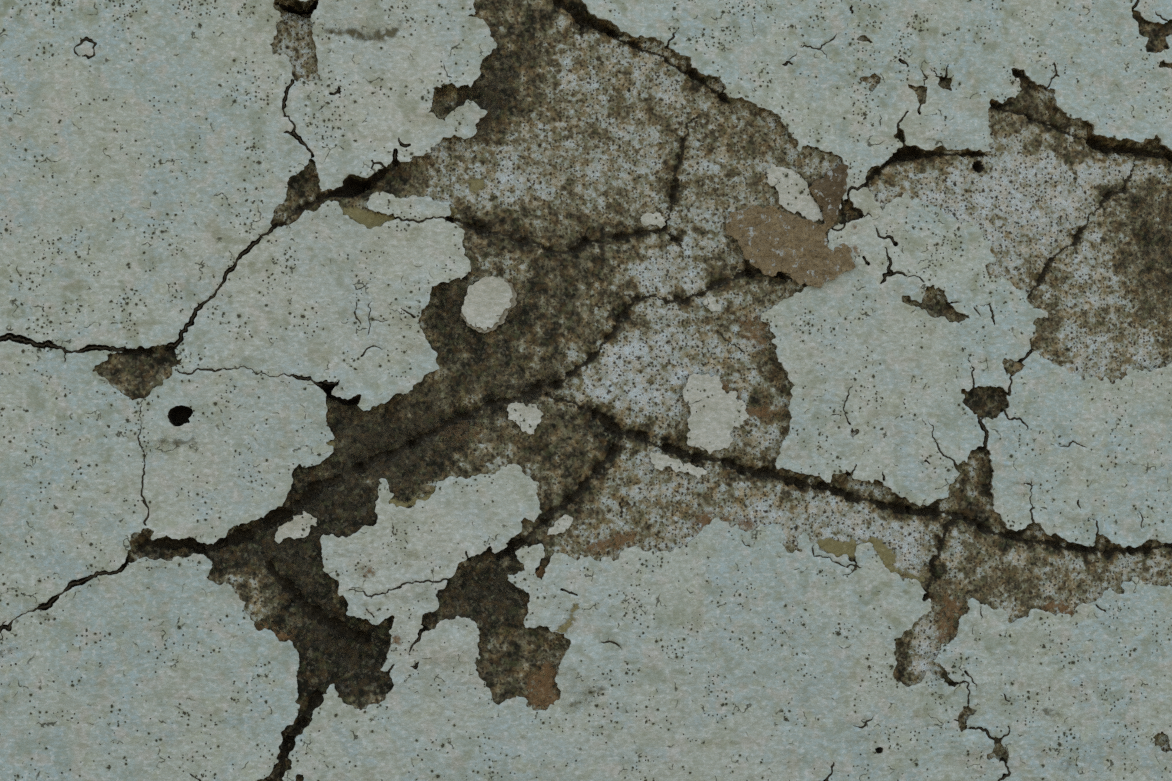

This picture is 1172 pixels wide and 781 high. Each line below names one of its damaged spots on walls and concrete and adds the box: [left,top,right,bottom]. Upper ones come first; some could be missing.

crack [282,80,314,160]
crack [394,0,726,254]
peeling [725,164,863,288]
peeling [866,68,1172,383]
crack [0,194,340,390]
peeling [507,402,543,434]
crack [0,269,1172,644]
peeling [649,451,707,479]
peeling [682,374,749,454]
peeling [421,546,571,711]
crack [267,690,324,781]
crack [949,670,1011,781]